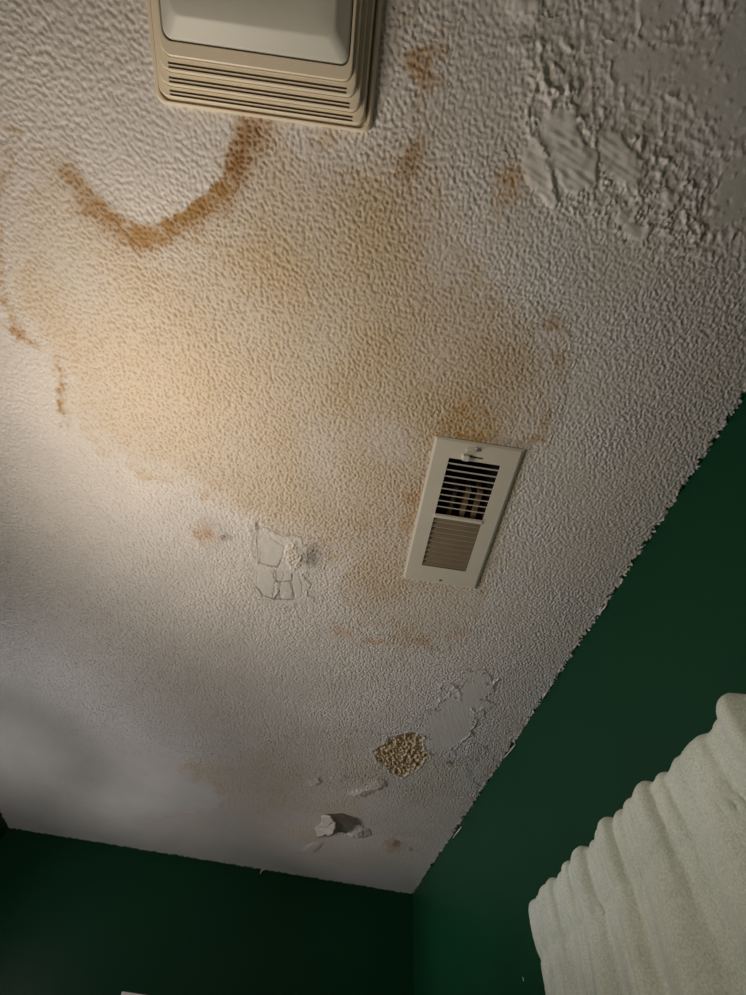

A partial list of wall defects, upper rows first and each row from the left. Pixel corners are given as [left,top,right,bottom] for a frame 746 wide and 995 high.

peeling [521,107,645,212]
peeling [654,184,682,212]
water stain [0,18,577,655]
flaking render [372,733,433,779]